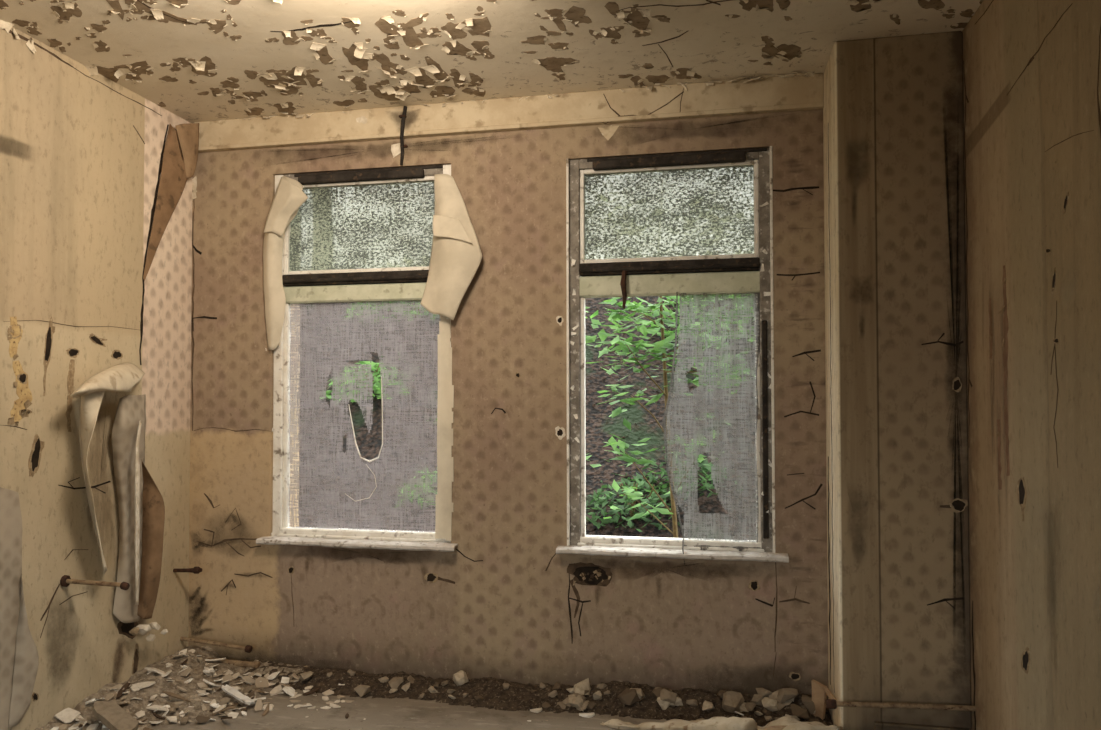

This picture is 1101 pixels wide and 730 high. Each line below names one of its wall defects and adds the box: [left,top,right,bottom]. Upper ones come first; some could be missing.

peeling [725,0,792,21]
peeling [845,0,882,12]
peeling [918,0,984,29]
peeling [0,0,497,116]
peeling [520,0,670,80]
peeling [747,36,802,66]
peeling [618,63,702,86]
spalling [31,438,40,472]